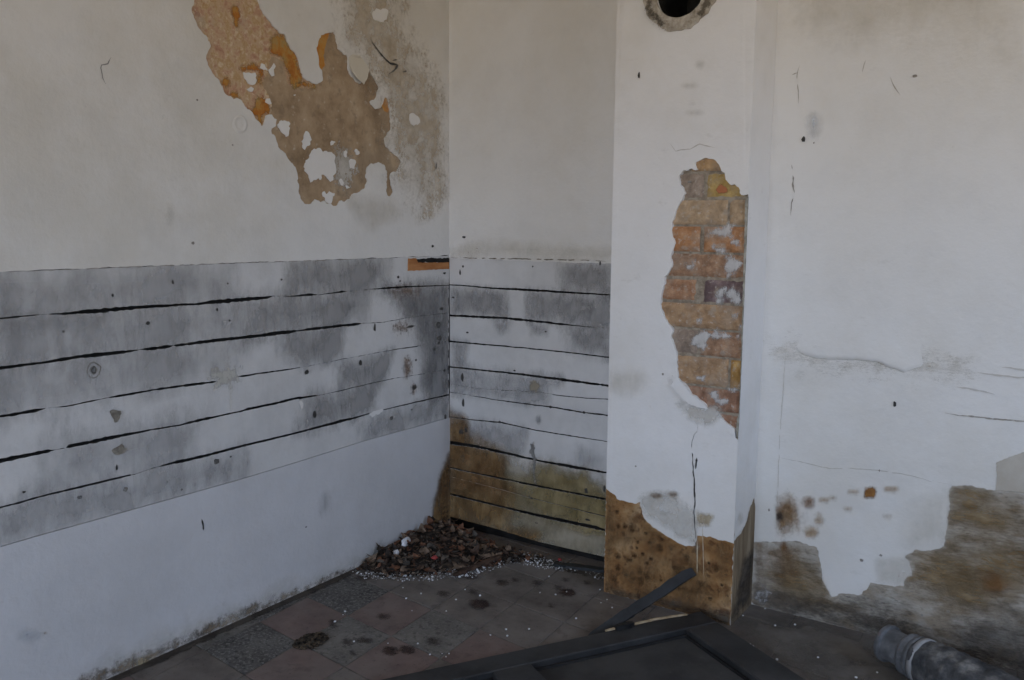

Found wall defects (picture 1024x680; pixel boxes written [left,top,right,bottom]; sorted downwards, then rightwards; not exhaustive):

peeling [192,0,445,218]
crack [10,258,382,273]
water stain [250,259,380,363]
water stain [370,287,508,435]
water stain [476,426,606,557]
water stain [526,265,611,349]
crack [691,436,704,574]
spalling [661,158,749,439]
crack [776,353,945,524]
crack [948,367,1024,422]
peeling [604,485,1024,672]